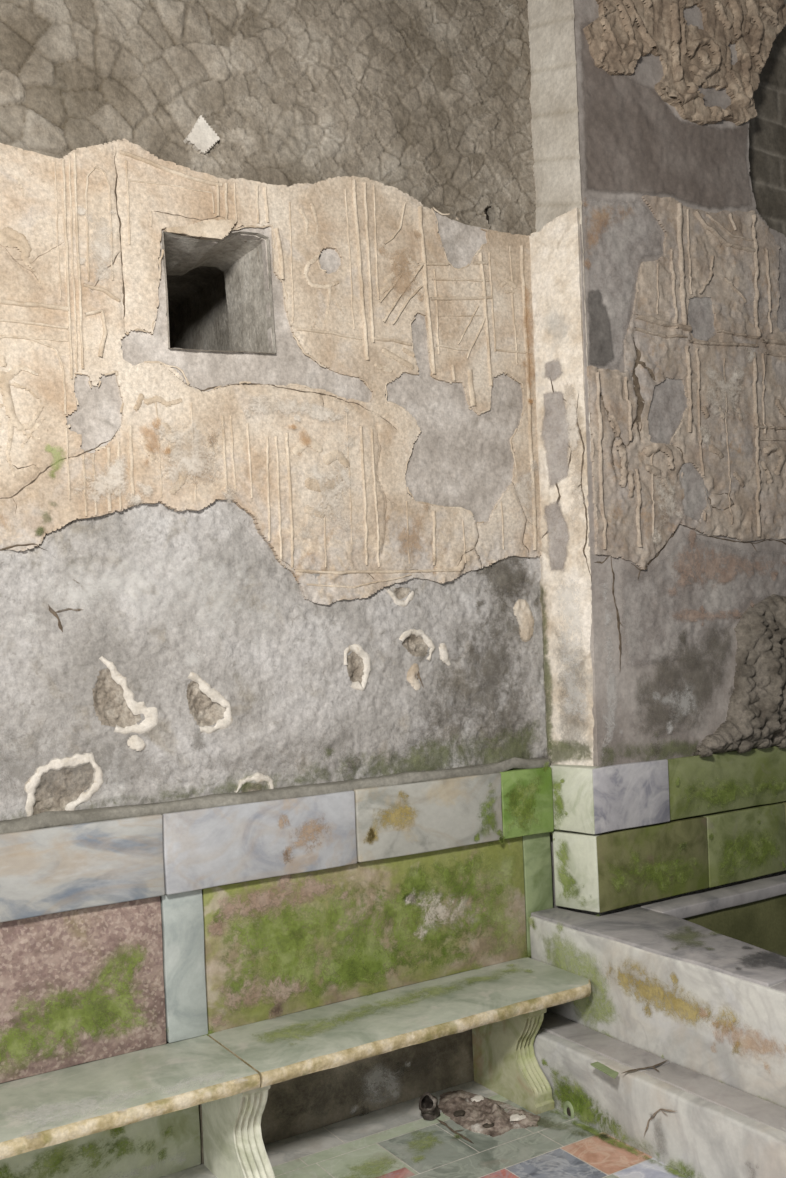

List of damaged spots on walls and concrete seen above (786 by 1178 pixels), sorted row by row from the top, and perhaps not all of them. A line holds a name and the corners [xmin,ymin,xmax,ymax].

flaking render [66,225,525,523]
crack [550,337,786,667]
spalling [344,644,371,691]
spalling [399,629,435,661]
spalling [92,656,158,751]
spalling [186,672,233,734]
spalling [24,752,104,817]
spalling [234,772,274,793]
water stain [208,875,348,935]
water stain [406,894,472,938]
water stain [213,976,306,1025]
water stain [610,964,741,1052]